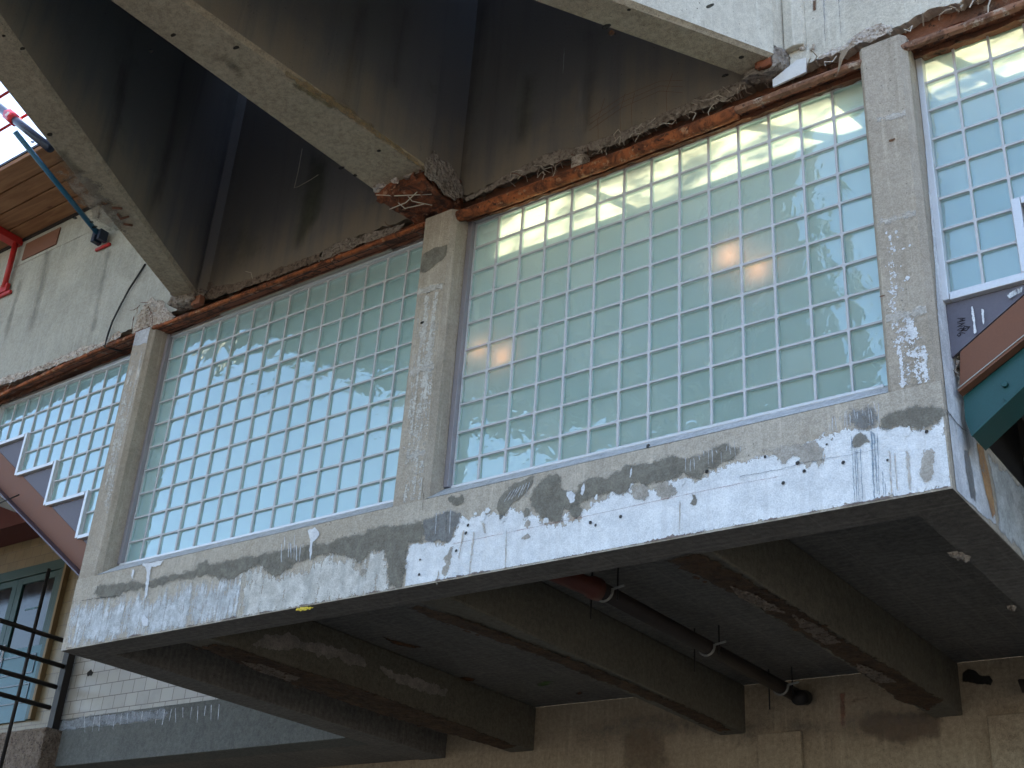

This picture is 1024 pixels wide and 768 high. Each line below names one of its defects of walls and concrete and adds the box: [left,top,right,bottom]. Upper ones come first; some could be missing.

spalling [320,45,790,261]
peeling [160,148,996,632]
leakage [69,495,464,647]
peeling [252,631,367,667]